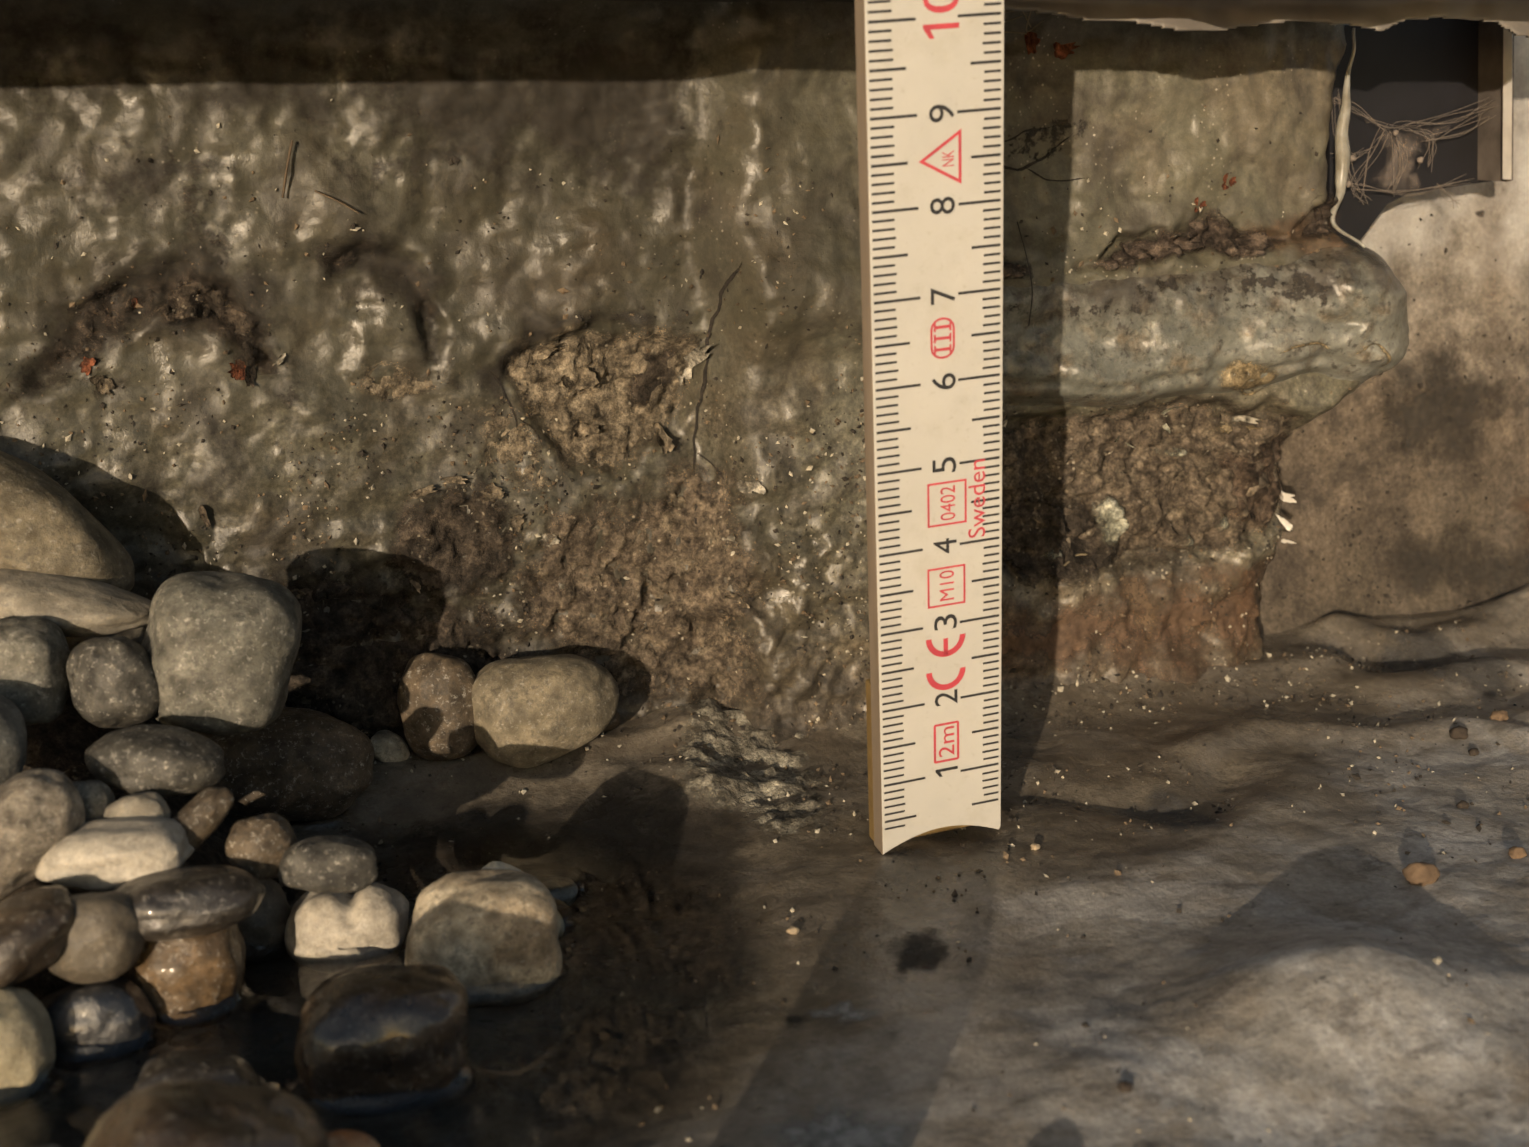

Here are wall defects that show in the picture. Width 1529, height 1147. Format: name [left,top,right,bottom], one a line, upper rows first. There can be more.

peeling [1004,0,1529,38]
spalling [1003,259,1032,280]
spalling [1095,209,1285,271]
spalling [1302,194,1339,238]
leakage [1385,354,1501,456]
spalling [1002,359,1304,587]
leakage [402,783,745,942]